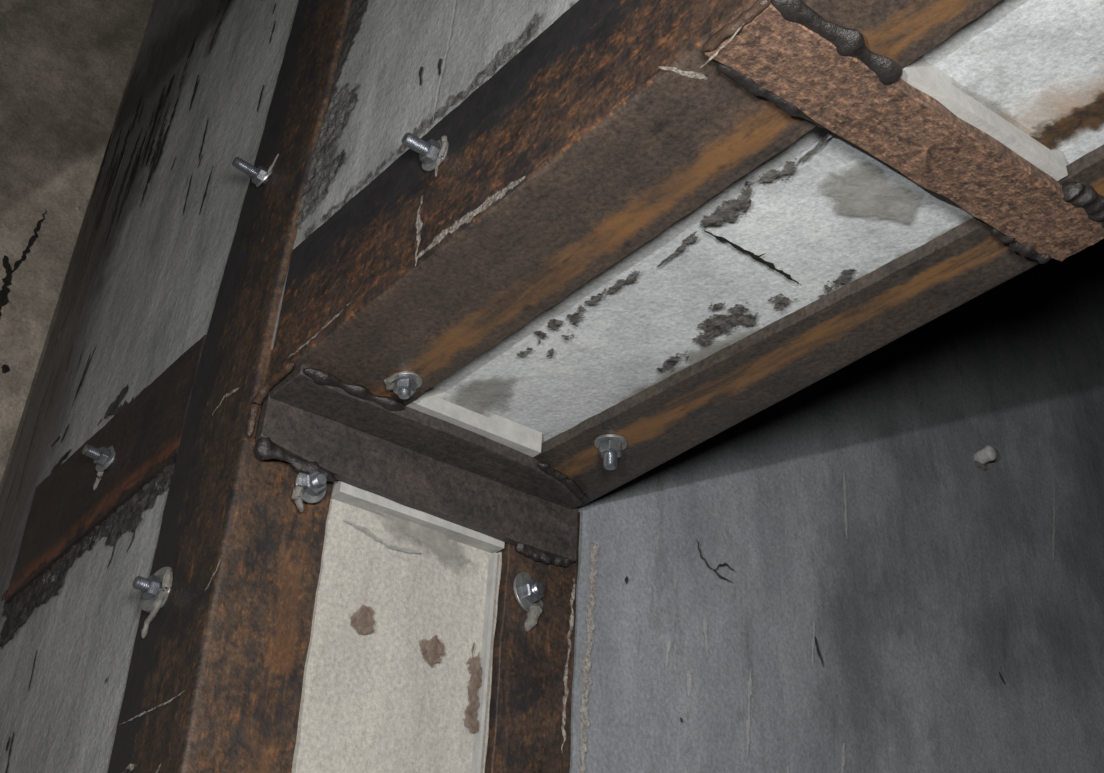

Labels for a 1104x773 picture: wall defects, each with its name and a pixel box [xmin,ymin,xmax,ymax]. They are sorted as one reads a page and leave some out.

rust [1030,88,1104,150]
leakage [820,160,920,223]
crack [0,211,47,316]
crack [704,230,799,284]
peeling [768,294,797,315]
peeling [818,268,862,298]
peeling [657,302,759,372]
spalling [0,463,175,649]